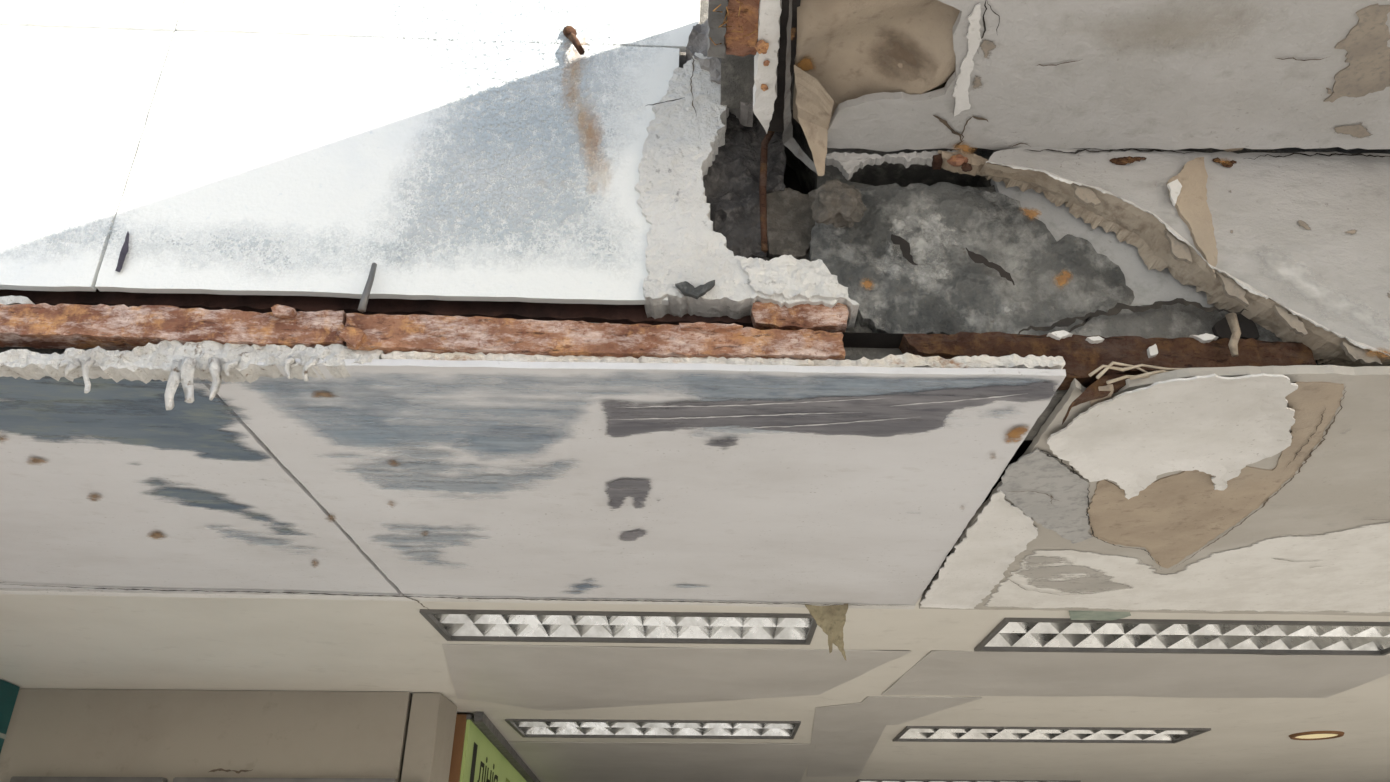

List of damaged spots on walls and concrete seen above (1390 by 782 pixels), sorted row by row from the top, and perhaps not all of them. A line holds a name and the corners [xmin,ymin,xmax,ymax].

spalling [686,19,721,84]
crack [933,115,988,148]
crack [1012,143,1192,154]
crack [1244,152,1390,160]
spalling [703,0,1390,367]
efflorescence [0,295,34,305]
peeling [679,322,743,334]
efflorescence [0,340,1065,410]
peeling [258,374,1057,499]
peeling [605,479,659,511]
peeling [920,373,1298,609]
peeling [620,530,646,541]